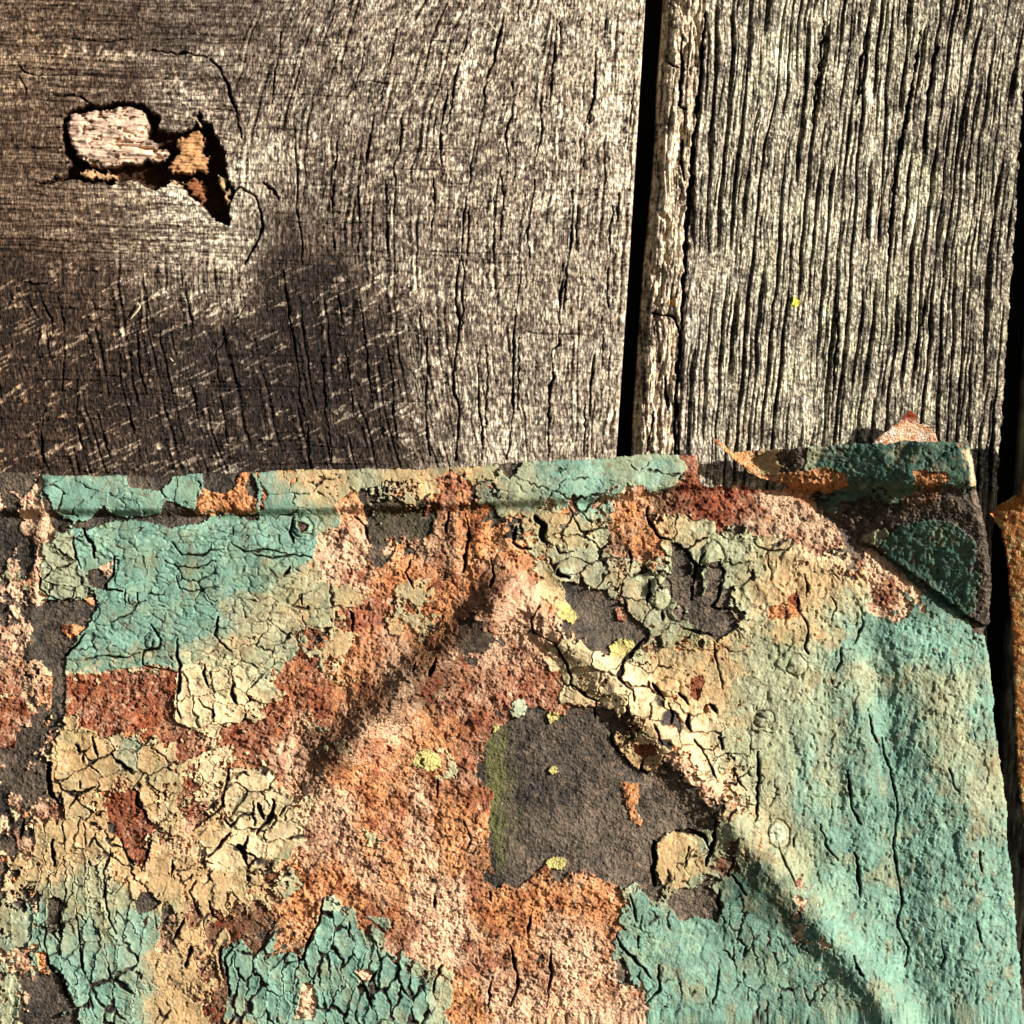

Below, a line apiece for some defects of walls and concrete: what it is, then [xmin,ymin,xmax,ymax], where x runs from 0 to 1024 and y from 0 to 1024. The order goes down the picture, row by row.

crack [46,737,287,968]
crack [36,517,313,723]
peeling [0,453,804,1024]
rust [353,505,509,621]
rust [282,614,646,1024]
crack [512,507,607,580]
crack [530,507,762,823]
rust [613,467,849,557]
rust [767,592,800,620]
crack [820,824,862,896]
crack [869,717,910,967]
rust [859,549,927,607]